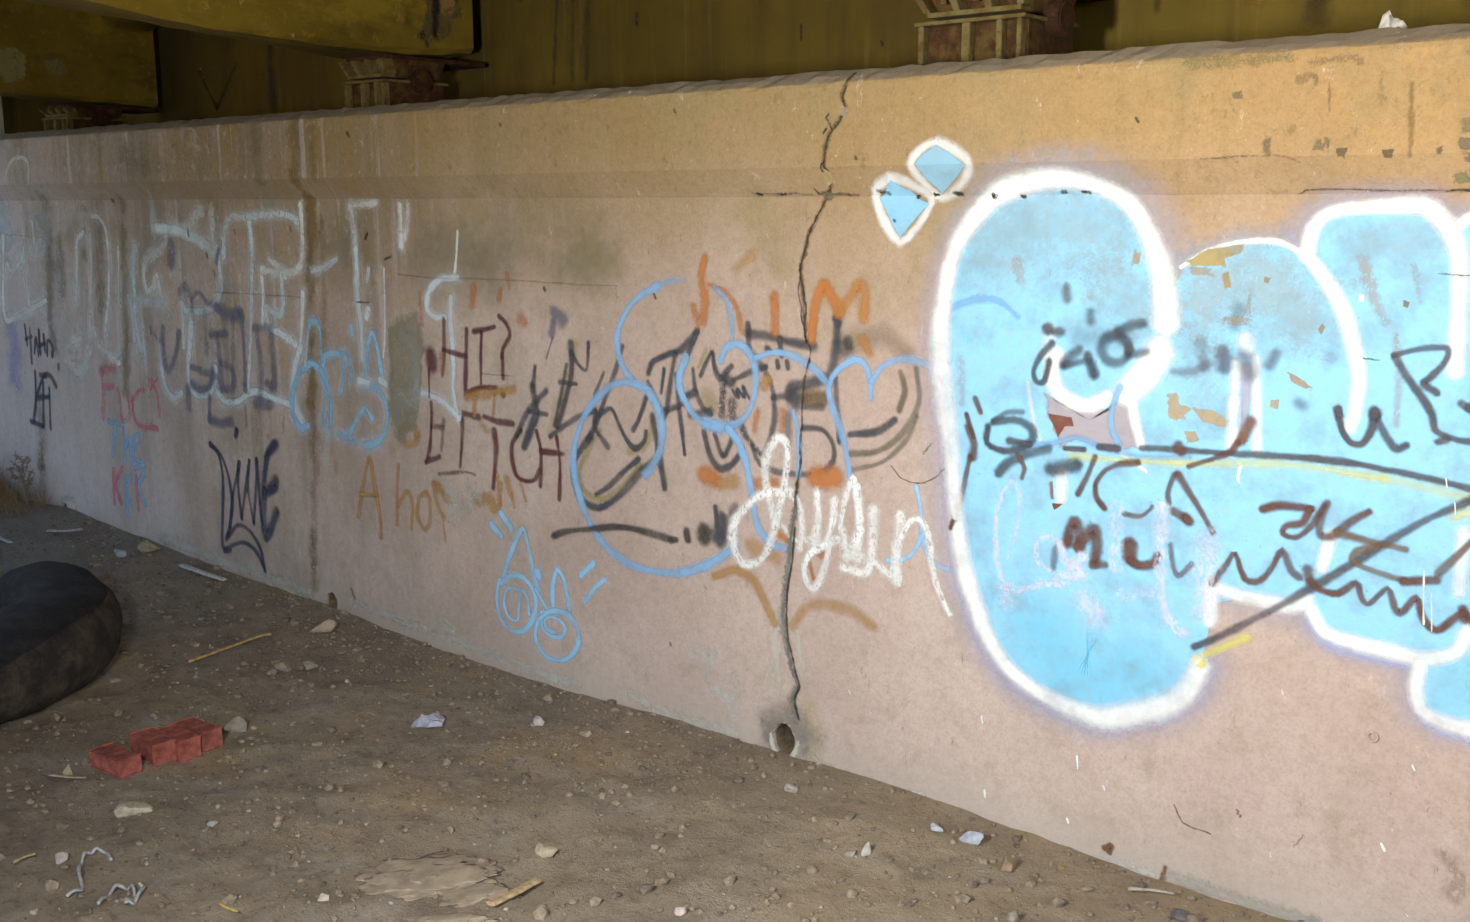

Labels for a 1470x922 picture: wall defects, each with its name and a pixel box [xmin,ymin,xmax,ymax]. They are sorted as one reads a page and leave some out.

crack [877,190,1026,199]
crack [1300,187,1470,195]
crack [757,73,855,723]
crack [891,466,945,484]